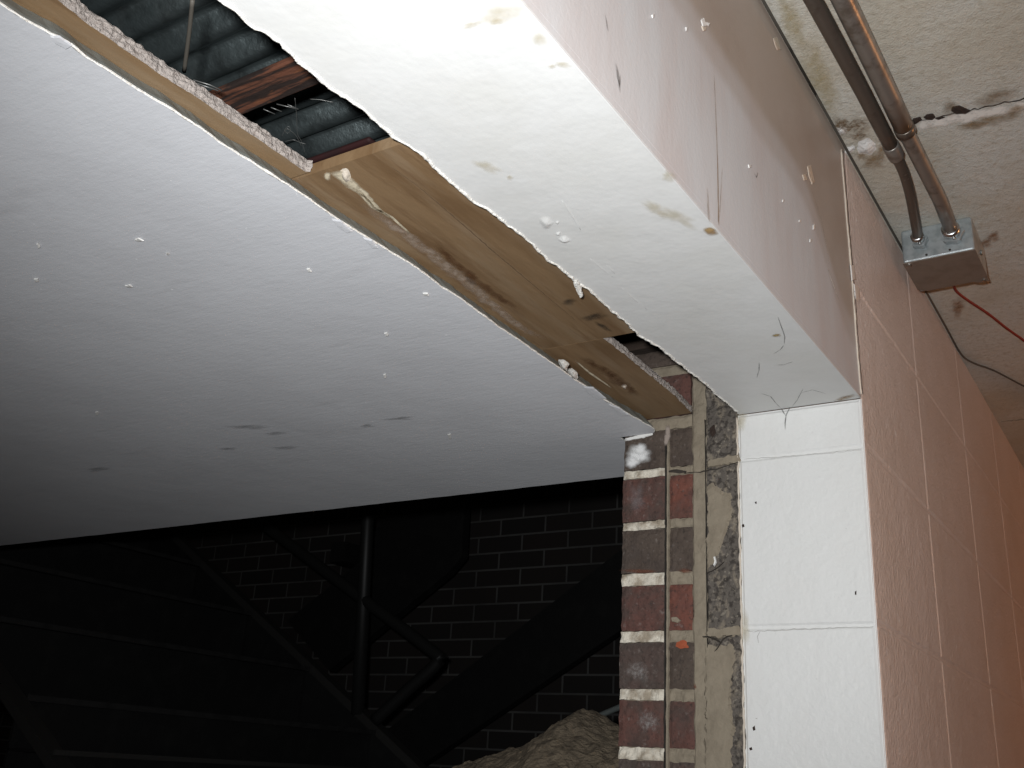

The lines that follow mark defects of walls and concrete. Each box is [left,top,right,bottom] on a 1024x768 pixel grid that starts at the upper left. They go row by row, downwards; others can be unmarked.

peeling [50,35,73,49]
spalling [59,0,313,172]
crack [912,98,1024,124]
peeling [332,219,379,248]
spalling [603,337,692,412]
peeling [583,386,629,416]
water stain [627,444,645,467]